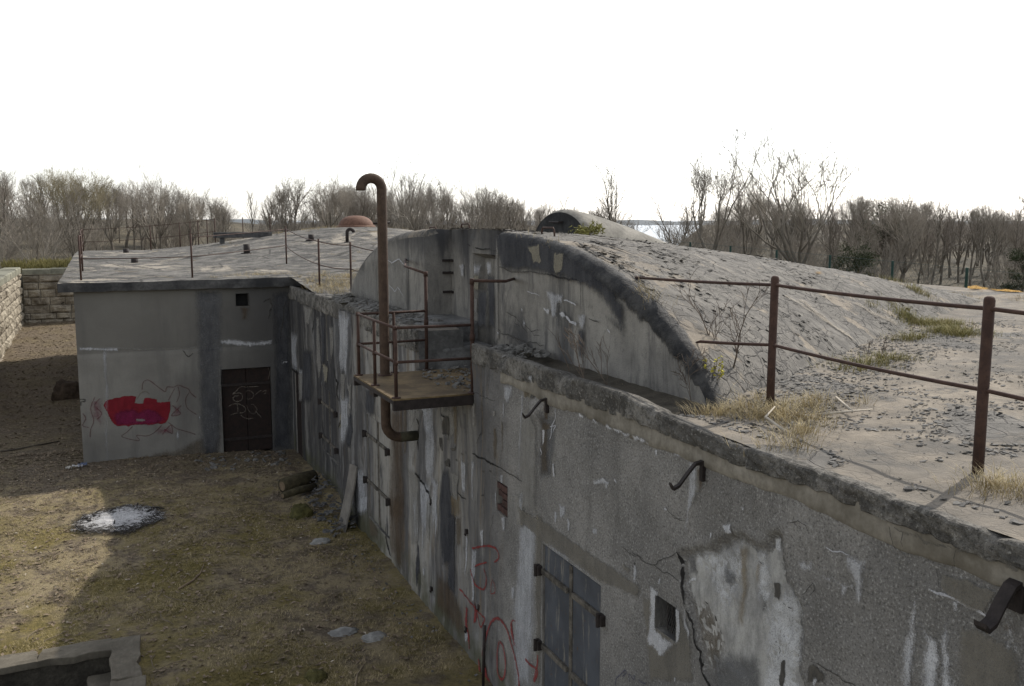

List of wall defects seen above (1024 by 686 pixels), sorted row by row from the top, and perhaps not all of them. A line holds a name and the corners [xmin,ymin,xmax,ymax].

damp [460,235,623,333]
damp [527,291,585,357]
peeling [450,227,1024,482]
damp [352,472,367,512]
damp [409,408,483,600]
peeling [887,477,1024,524]
peeling [519,509,693,683]
crack [621,546,710,686]
flaking render [688,539,804,686]